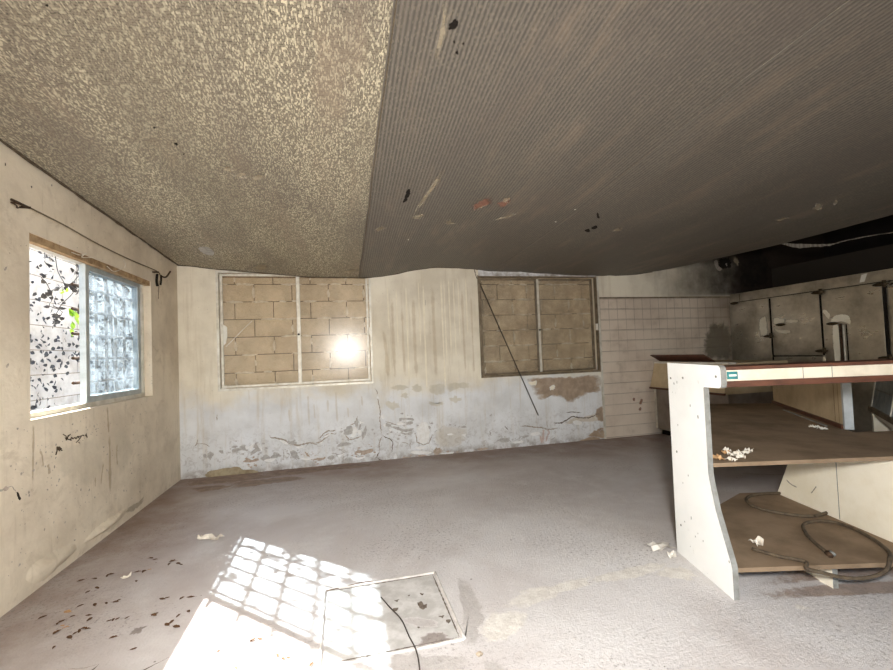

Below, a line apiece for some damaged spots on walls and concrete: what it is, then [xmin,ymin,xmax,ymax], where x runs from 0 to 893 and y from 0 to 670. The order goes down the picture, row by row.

peeling [198,416,379,468]
flaking render [385,413,468,459]
crack [0,486,21,500]